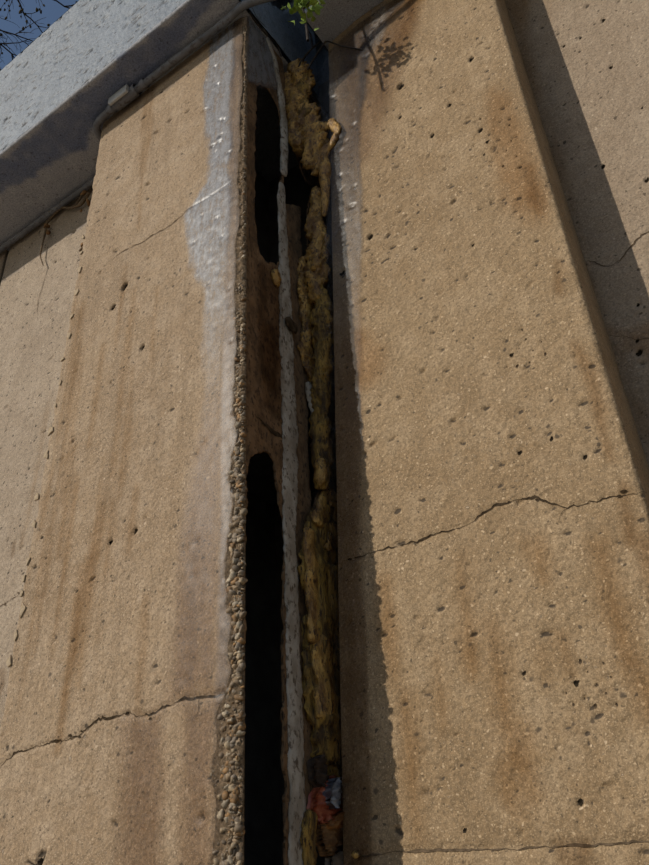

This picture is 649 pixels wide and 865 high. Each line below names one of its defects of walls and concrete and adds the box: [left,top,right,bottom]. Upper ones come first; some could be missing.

crack [113,195,211,259]
crack [590,231,649,266]
spalling [209,23,248,865]
crack [347,489,647,561]
crack [0,694,222,767]
crack [352,840,649,859]